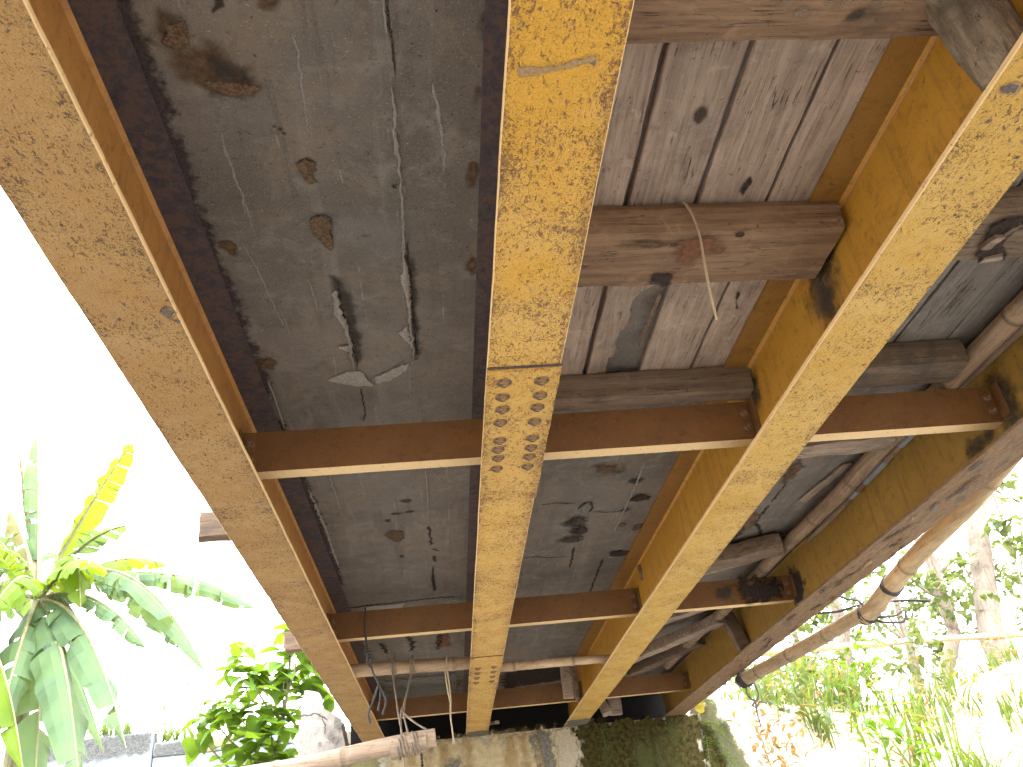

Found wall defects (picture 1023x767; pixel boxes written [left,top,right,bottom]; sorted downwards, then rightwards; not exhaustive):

crack [212,0,224,13]
crack [258,0,278,10]
crack [382,0,406,253]
spalling [296,158,317,184]
spalling [310,214,334,251]